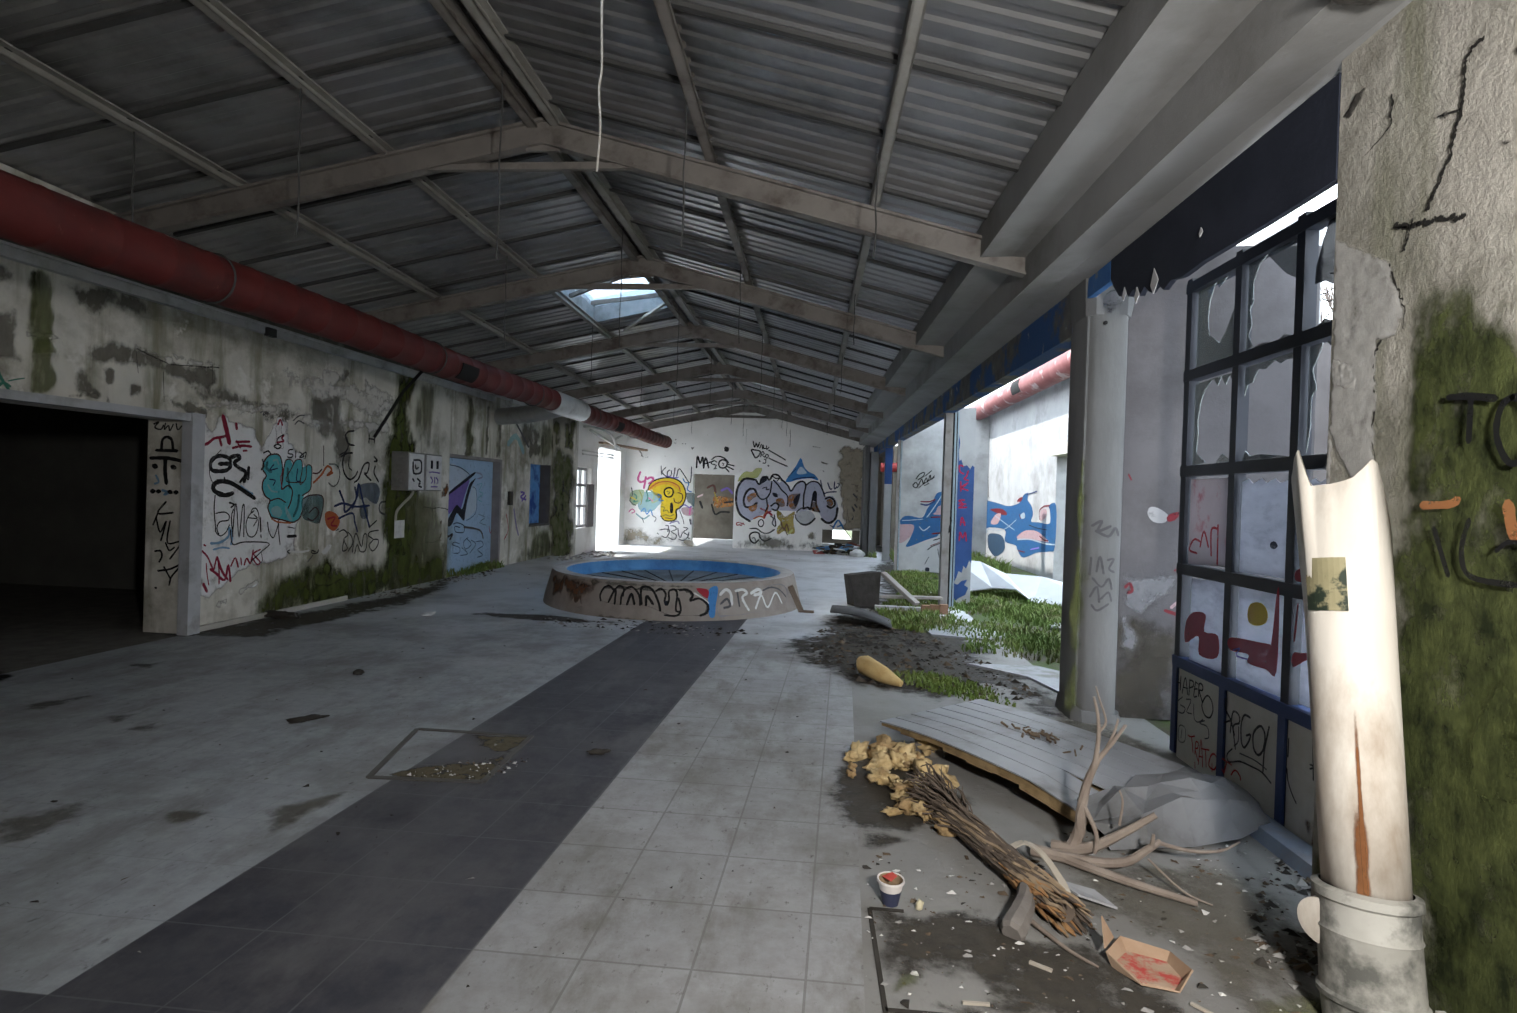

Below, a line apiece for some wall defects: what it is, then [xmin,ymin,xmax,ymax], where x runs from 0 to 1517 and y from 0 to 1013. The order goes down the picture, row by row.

crack [1365,94,1394,155]
crack [1371,35,1485,457]
leakage [0,314,56,359]
peeling [1326,240,1403,484]
leakage [388,384,415,456]
leakage [386,503,410,574]